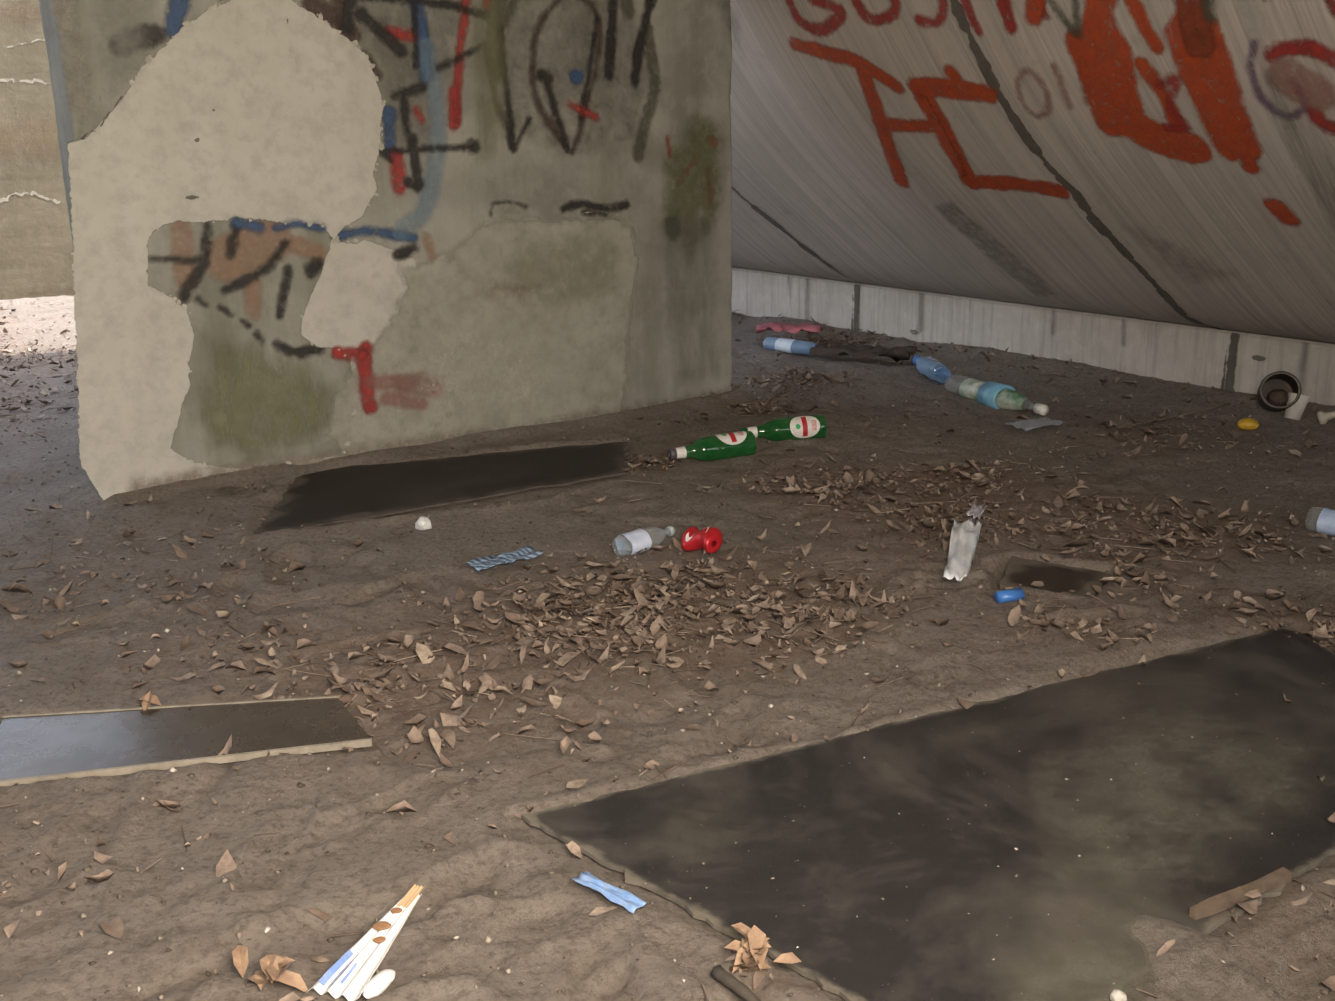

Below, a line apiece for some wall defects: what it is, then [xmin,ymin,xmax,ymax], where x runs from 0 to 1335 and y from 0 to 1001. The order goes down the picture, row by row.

peeling [67,0,638,500]